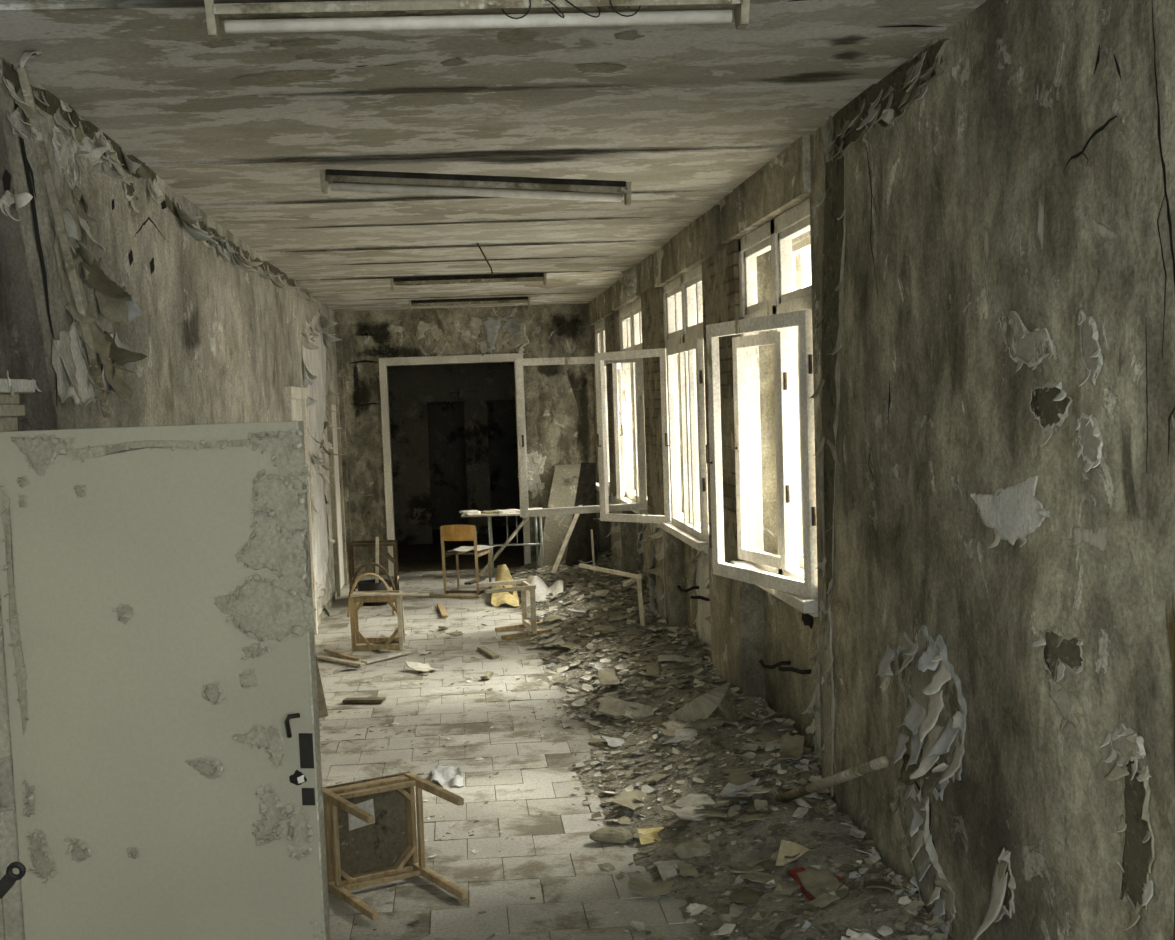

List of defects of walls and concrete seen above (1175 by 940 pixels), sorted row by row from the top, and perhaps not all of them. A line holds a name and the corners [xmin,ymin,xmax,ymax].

crack [1094,45,1122,81]
crack [1063,115,1117,172]
crack [1145,1,1175,472]
peeling [0,51,344,735]
water stain [353,322,423,415]
water stain [552,314,583,338]
peeling [994,309,1103,472]
peeling [510,38,967,940]
flaking render [970,475,1051,548]
flaking render [1031,624,1086,683]
flaking render [1100,723,1155,931]
peeling [972,848,1016,940]